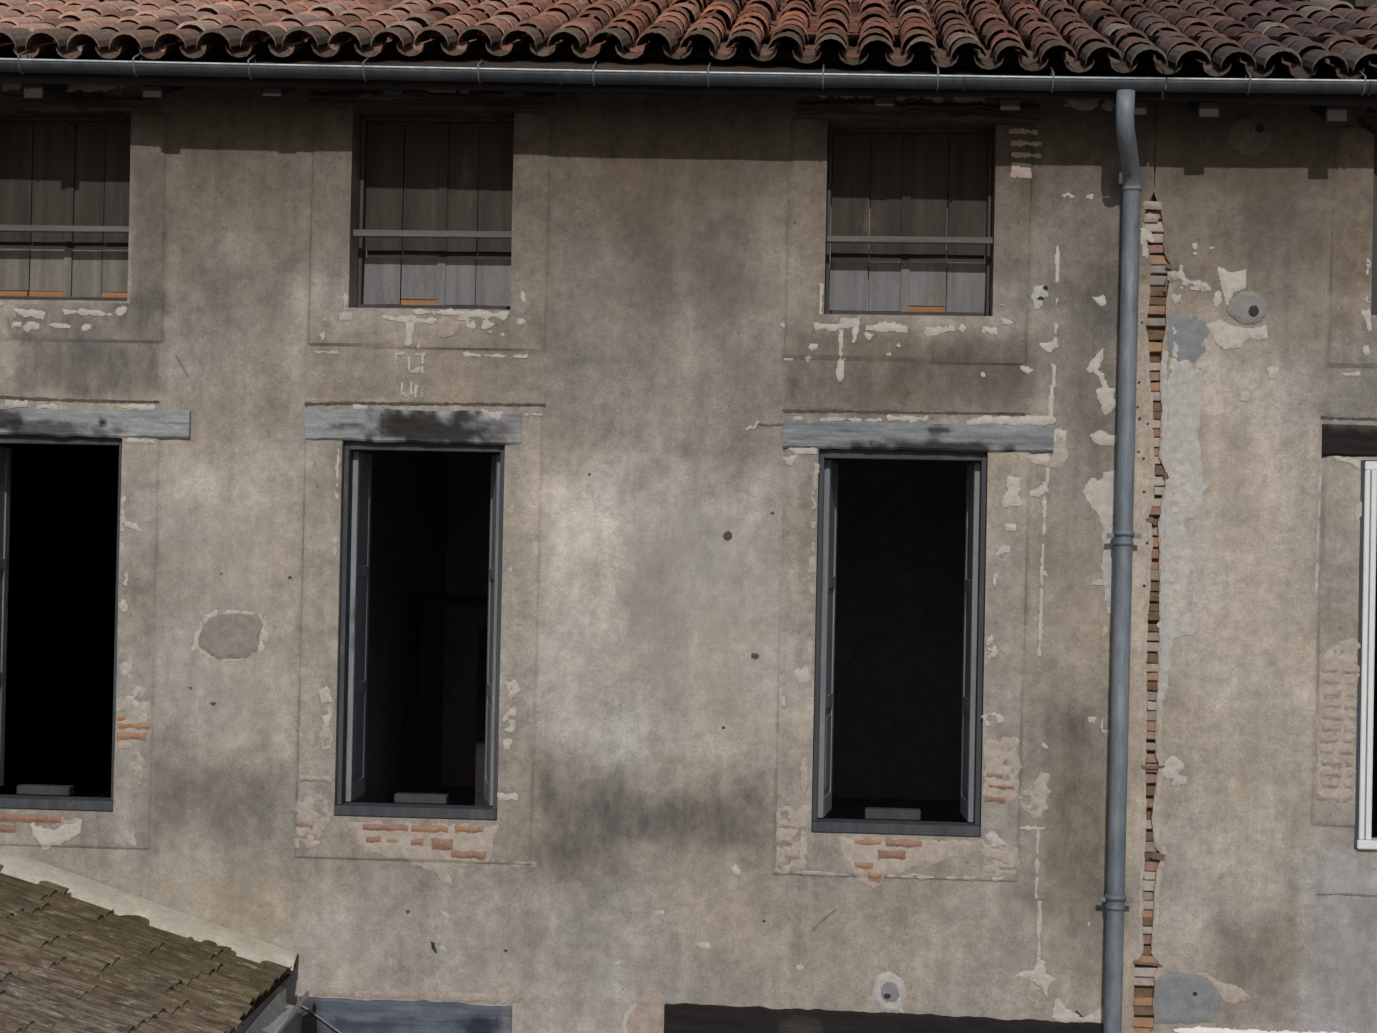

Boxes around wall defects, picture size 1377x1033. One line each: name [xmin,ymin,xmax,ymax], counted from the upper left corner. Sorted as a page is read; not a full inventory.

flaking render [784,283,908,381]
flaking render [1086,349,1117,446]
flaking render [1170,243,1268,350]
peeling [198,613,263,659]
flaking render [967,322,1068,656]
flaking render [1082,470,1116,636]
crack [1133,195,1179,1033]
flaking render [1156,327,1208,706]
flaking render [1315,638,1361,805]
flaking render [294,775,499,885]
flaking render [773,712,1104,1023]
peeling [1154,972,1355,1033]